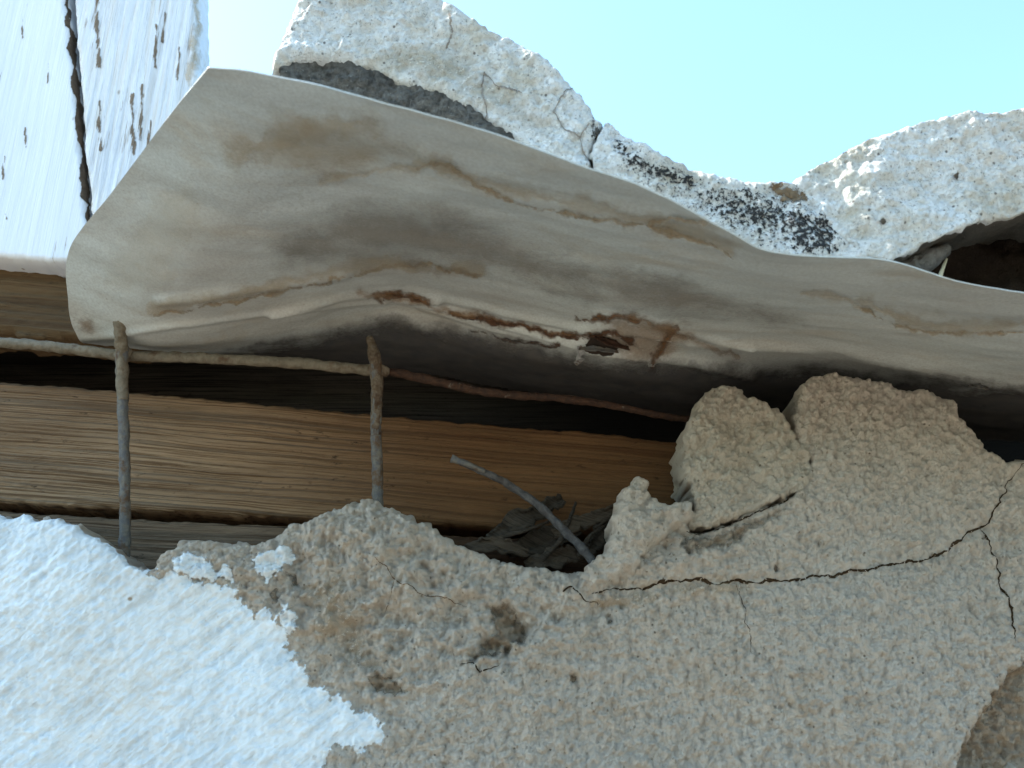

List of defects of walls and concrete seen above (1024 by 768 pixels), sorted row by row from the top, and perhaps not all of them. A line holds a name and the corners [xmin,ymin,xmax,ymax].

crack [445,12,453,49]
crack [481,72,522,120]
crack [553,88,590,158]
damp [550,210,731,258]
rust [113,321,130,400]
rust [366,336,384,435]
rust [650,326,680,368]
crack [563,463,1024,652]
peeling [0,514,386,768]
flaking render [368,675,401,696]